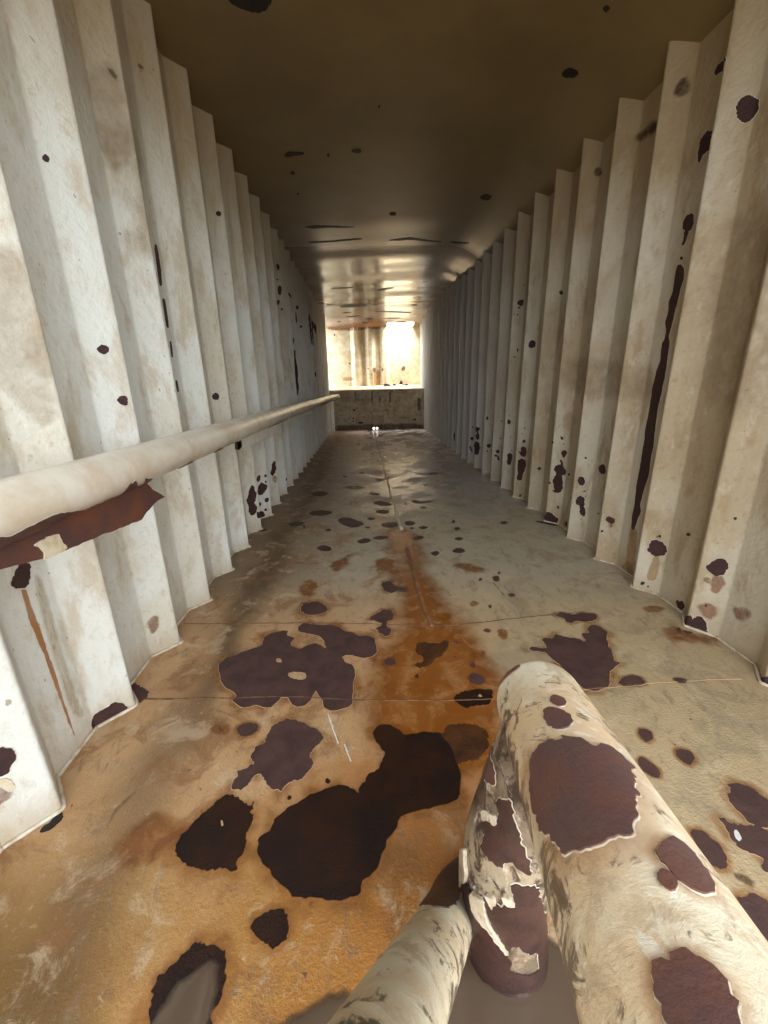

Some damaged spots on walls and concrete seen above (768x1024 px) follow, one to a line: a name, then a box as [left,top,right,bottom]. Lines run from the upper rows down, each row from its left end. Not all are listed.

rust [714,55,727,76]
rust [698,130,713,163]
rust [624,213,694,588]
rust [469,415,541,481]
peeling [34,534,67,559]
rust [667,558,729,644]
rust [10,563,78,734]
rust [529,612,647,693]
rust [118,461,549,995]
rust [529,694,662,858]
rust [654,781,768,942]
rust [650,947,744,1024]